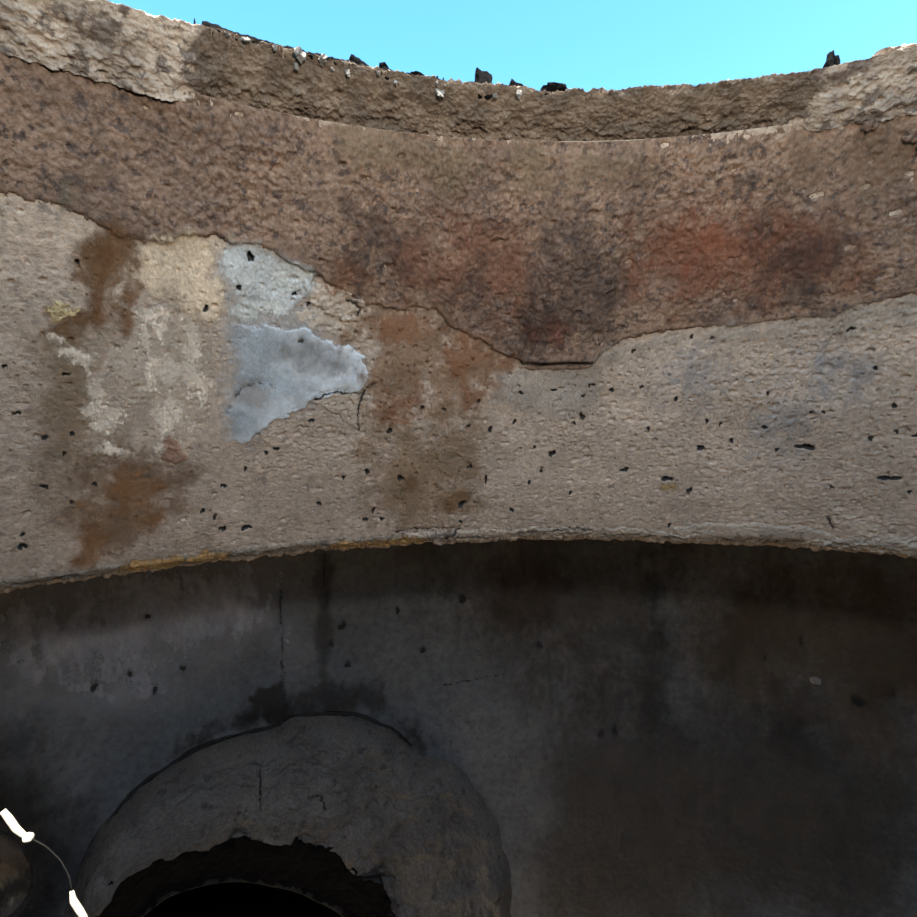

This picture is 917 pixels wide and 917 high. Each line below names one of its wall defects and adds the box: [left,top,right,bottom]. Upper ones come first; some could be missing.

damp [46,227,316,457]
peeling [0,51,917,444]